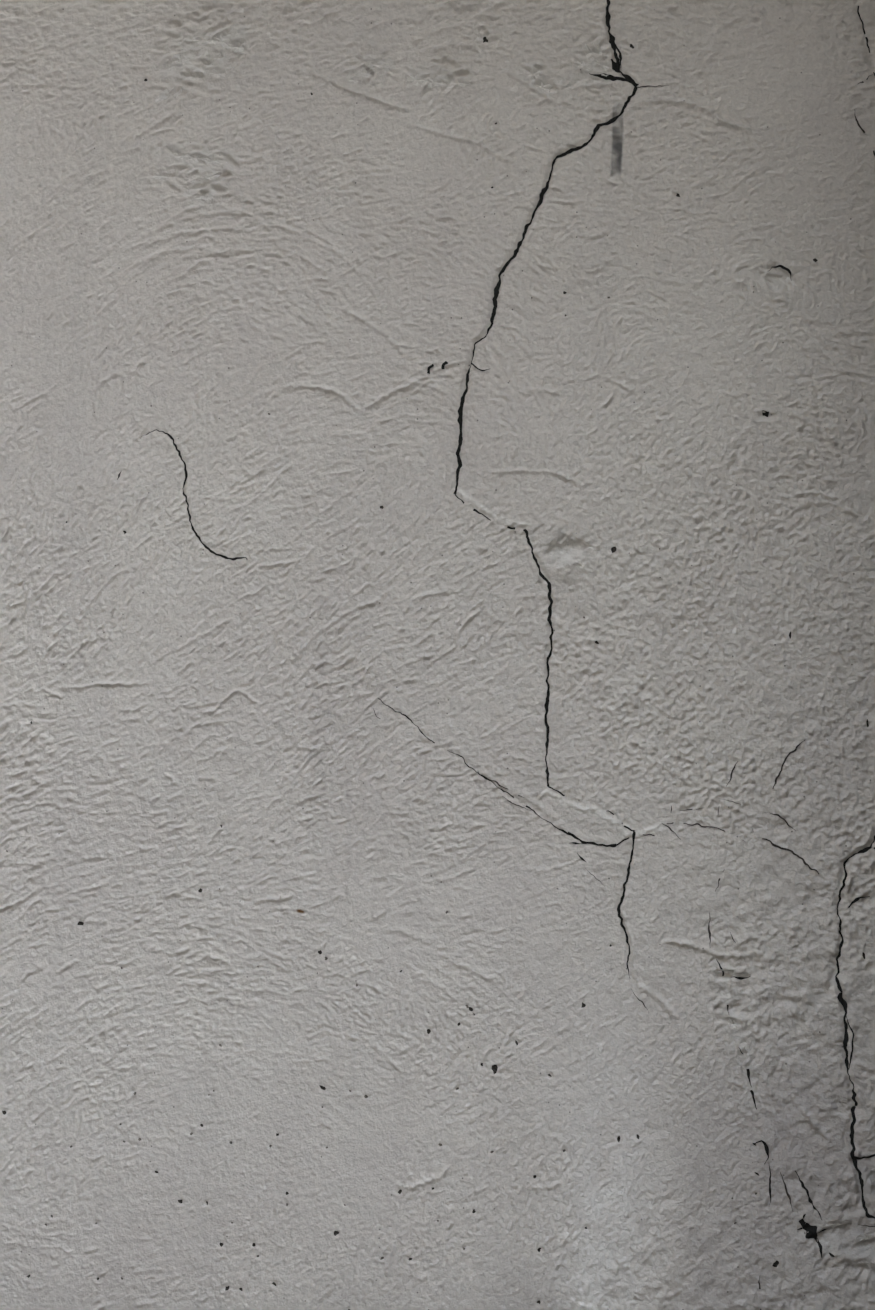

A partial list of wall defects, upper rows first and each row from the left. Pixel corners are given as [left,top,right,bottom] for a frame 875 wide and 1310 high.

crack [141,429,247,560]
crack [374,0,875,1227]